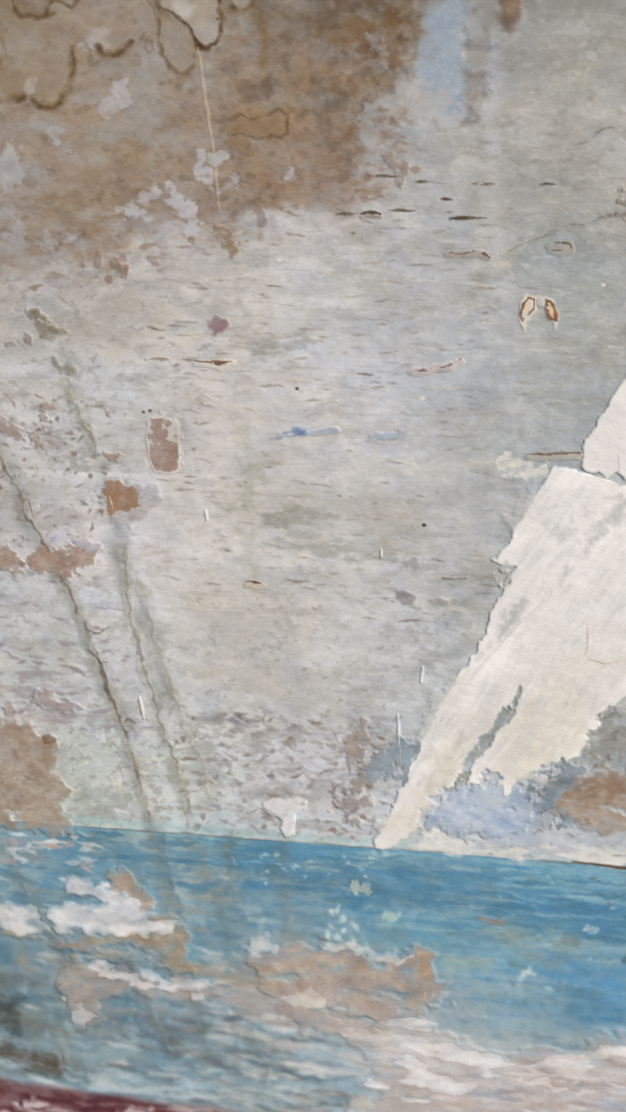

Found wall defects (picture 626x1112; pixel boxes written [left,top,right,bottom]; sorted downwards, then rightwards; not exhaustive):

leakage [0,0,259,114]
leakage [223,105,295,165]
crack [54,373,102,459]
peeling [100,408,185,531]
peeling [0,535,113,581]
crack [0,438,221,826]
peeling [393,588,452,607]
peeling [0,685,86,840]
peeling [235,930,626,1112]